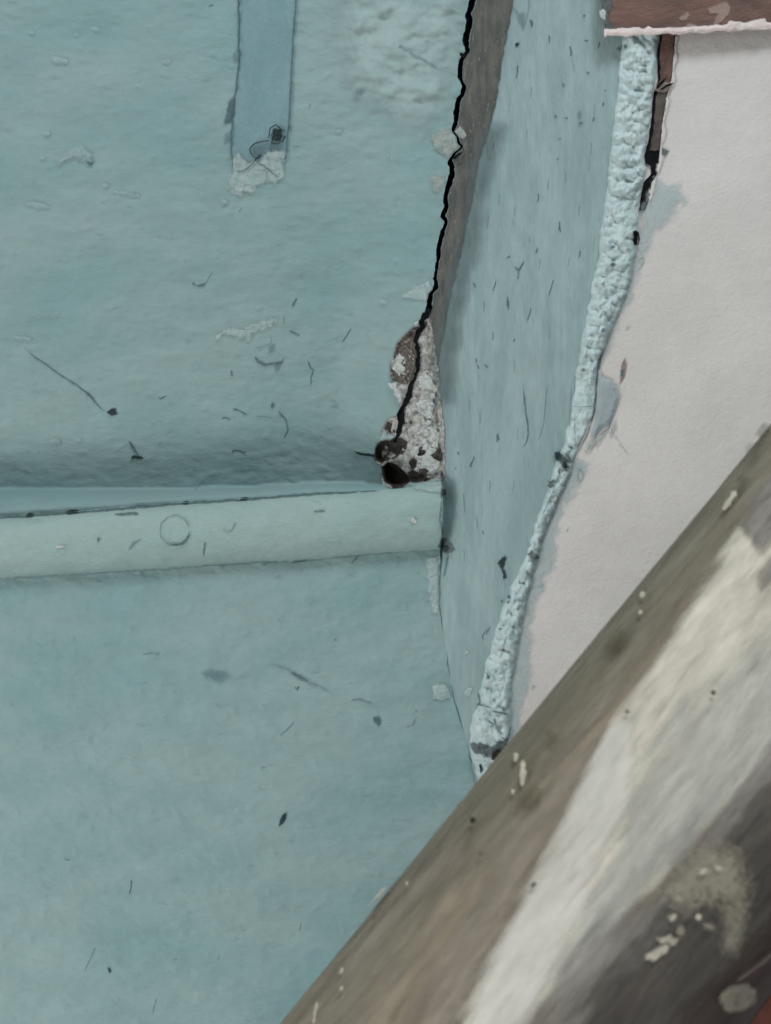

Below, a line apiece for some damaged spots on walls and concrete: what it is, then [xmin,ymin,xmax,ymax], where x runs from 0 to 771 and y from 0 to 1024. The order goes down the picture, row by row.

crack [393,0,476,443]
peeling [355,0,519,492]